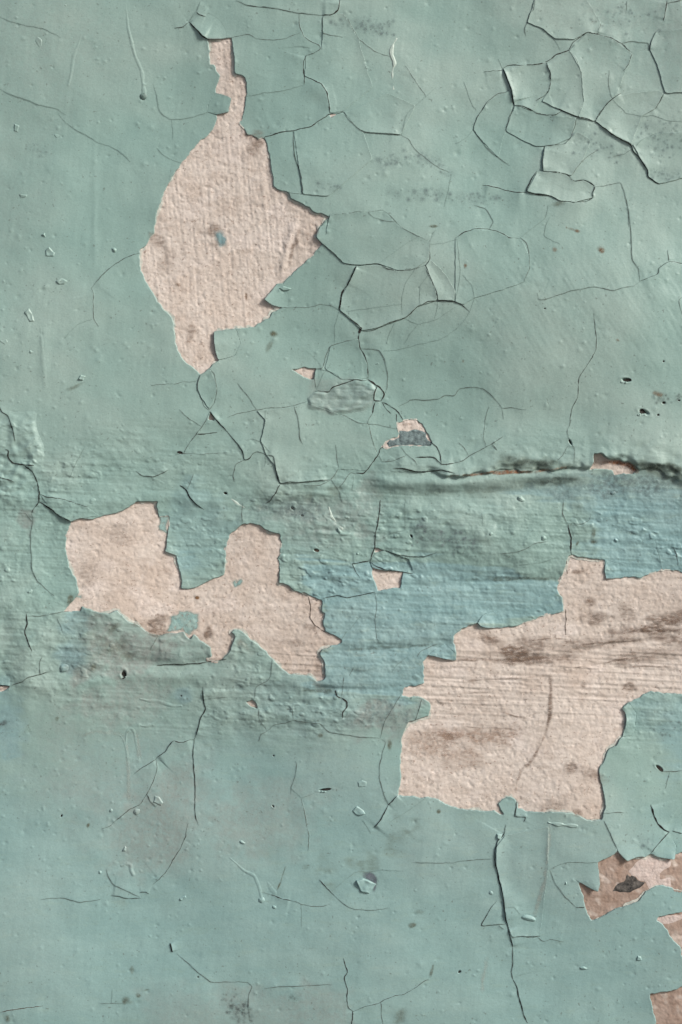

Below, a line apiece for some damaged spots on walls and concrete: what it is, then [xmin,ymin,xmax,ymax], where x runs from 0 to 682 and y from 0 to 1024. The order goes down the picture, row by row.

peeling [140,13,530,374]
crack [137,0,682,509]
peeling [258,403,431,483]
peeling [40,495,341,681]
crack [48,691,225,903]
crack [247,958,426,1024]
crack [254,664,424,830]
crack [455,802,562,1022]
peeling [398,555,682,820]
peeling [574,840,682,920]
peeling [650,987,682,1024]
crack [651,807,682,853]